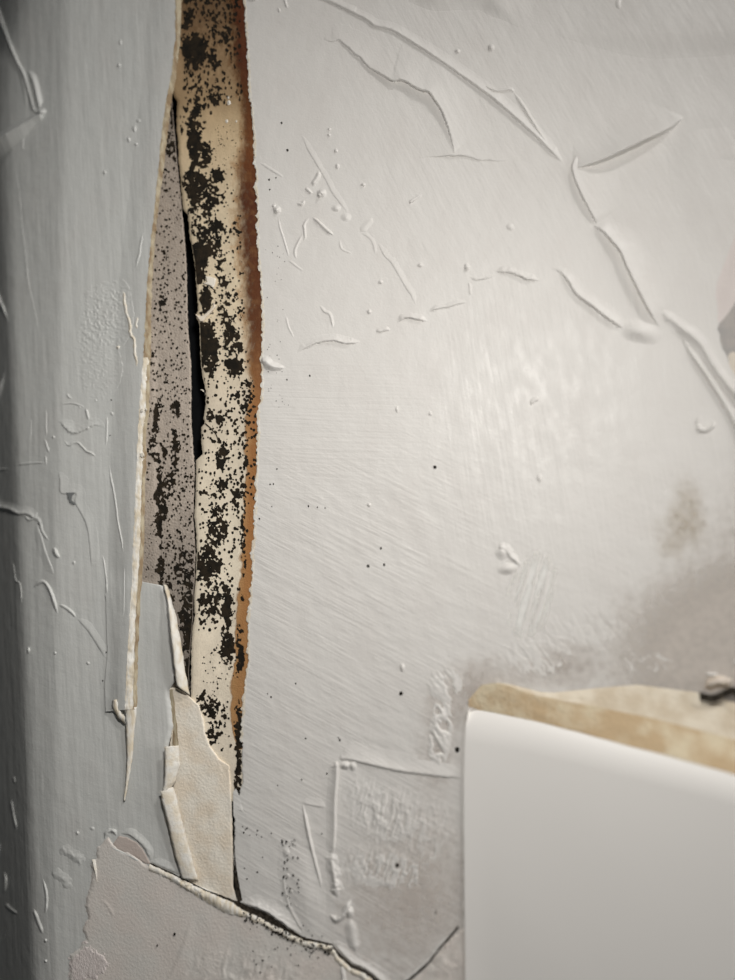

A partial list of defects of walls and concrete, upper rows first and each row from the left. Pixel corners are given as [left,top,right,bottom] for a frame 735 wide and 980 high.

crack [300,135,348,213]
spalling [716,237,735,374]
leakage [145,0,257,794]
crack [140,0,283,818]
peeling [68,828,363,980]
crack [149,850,459,980]
peeling [414,929,465,980]